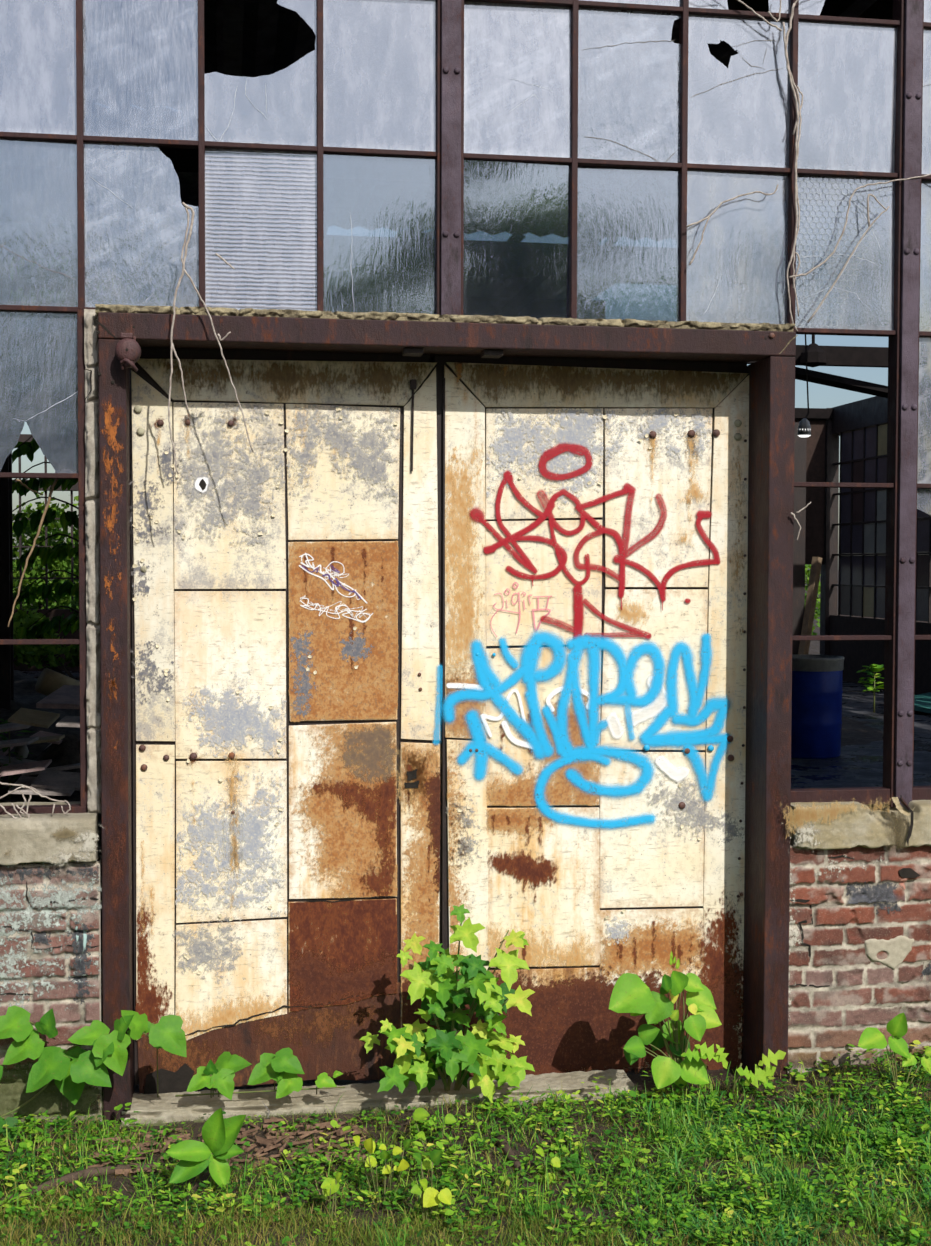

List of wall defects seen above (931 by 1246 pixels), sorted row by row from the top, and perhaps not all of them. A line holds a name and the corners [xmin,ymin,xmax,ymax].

rust [100,401,125,602]
rust [106,617,119,710]
rust [135,448,486,1077]
rust [486,687,601,902]
rust [458,891,745,1075]